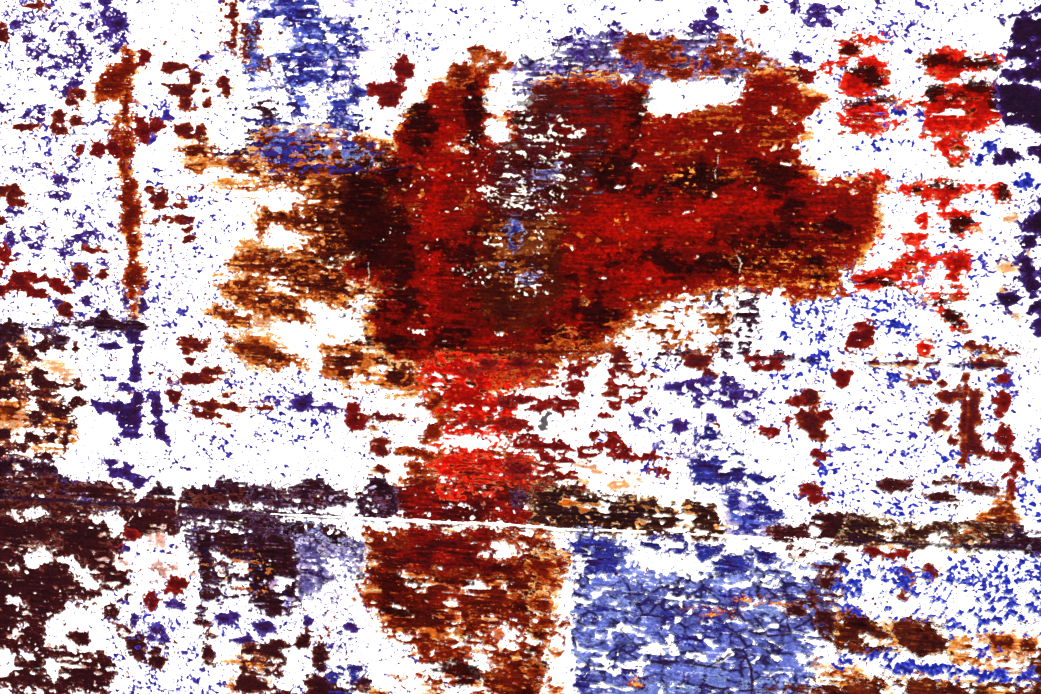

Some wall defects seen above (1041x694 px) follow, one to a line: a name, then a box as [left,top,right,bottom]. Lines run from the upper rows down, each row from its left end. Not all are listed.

rust [760,349,796,367]
rust [831,361,855,391]
rust [793,383,830,446]
crack [612,609,796,694]